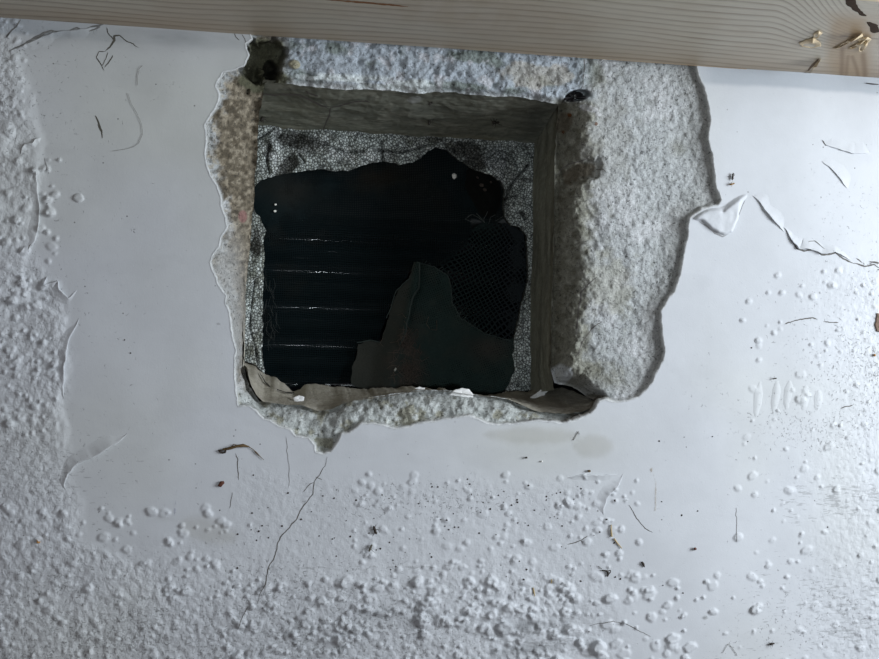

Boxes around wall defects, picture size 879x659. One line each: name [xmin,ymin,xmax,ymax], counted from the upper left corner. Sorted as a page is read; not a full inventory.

spalling [204,34,784,455]
crack [783,226,879,270]
crack [237,438,327,630]